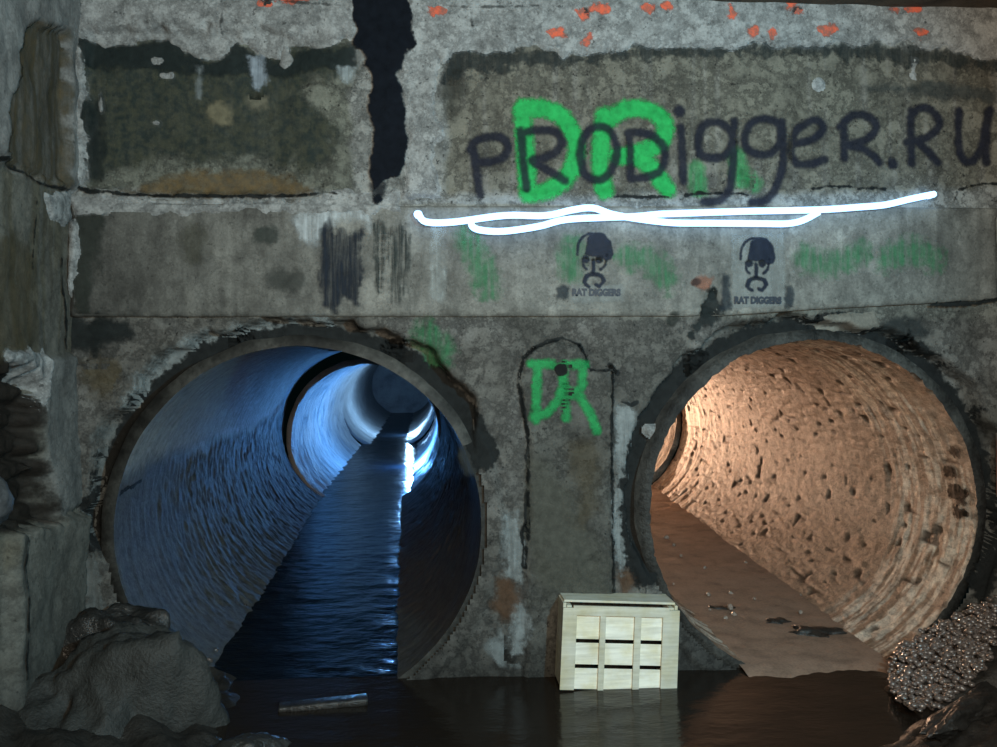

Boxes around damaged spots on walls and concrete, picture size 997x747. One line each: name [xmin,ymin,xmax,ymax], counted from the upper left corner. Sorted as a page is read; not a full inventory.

water stain [71,214,135,356]
water stain [121,211,410,410]
water stain [371,182,386,204]
flaking render [44,0,997,302]